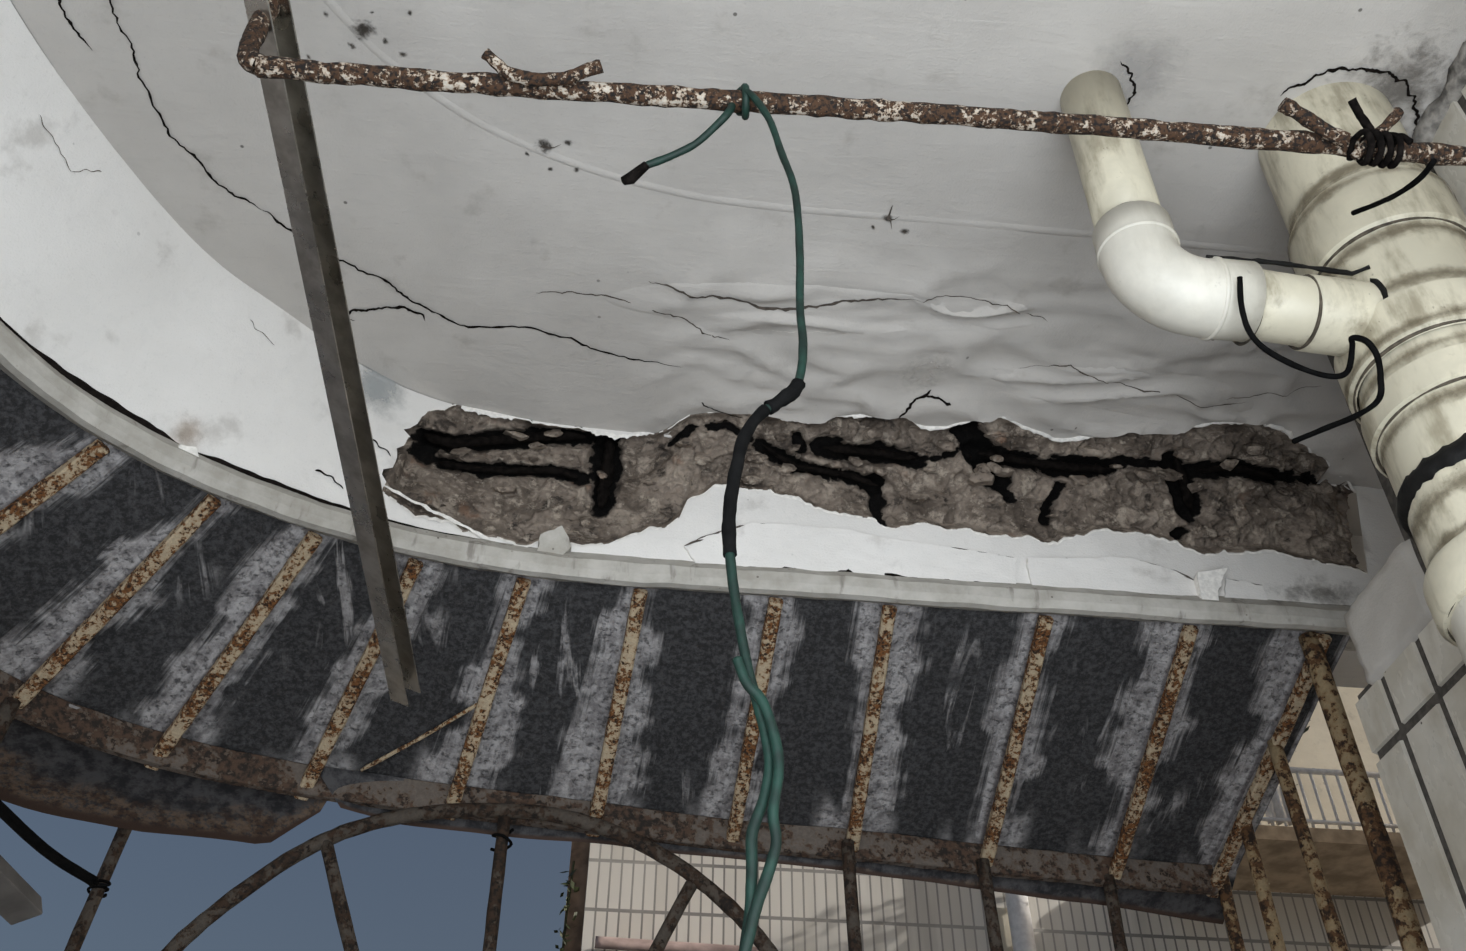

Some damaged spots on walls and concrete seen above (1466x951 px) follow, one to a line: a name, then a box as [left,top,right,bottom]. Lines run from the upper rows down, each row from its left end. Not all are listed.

crack [40,115,102,172]
crack [58,0,292,232]
crack [1282,66,1420,131]
crack [339,260,682,368]
crack [540,291,726,339]
leakage [362,370,396,401]
crack [899,390,951,418]
spalling [382,403,1433,685]